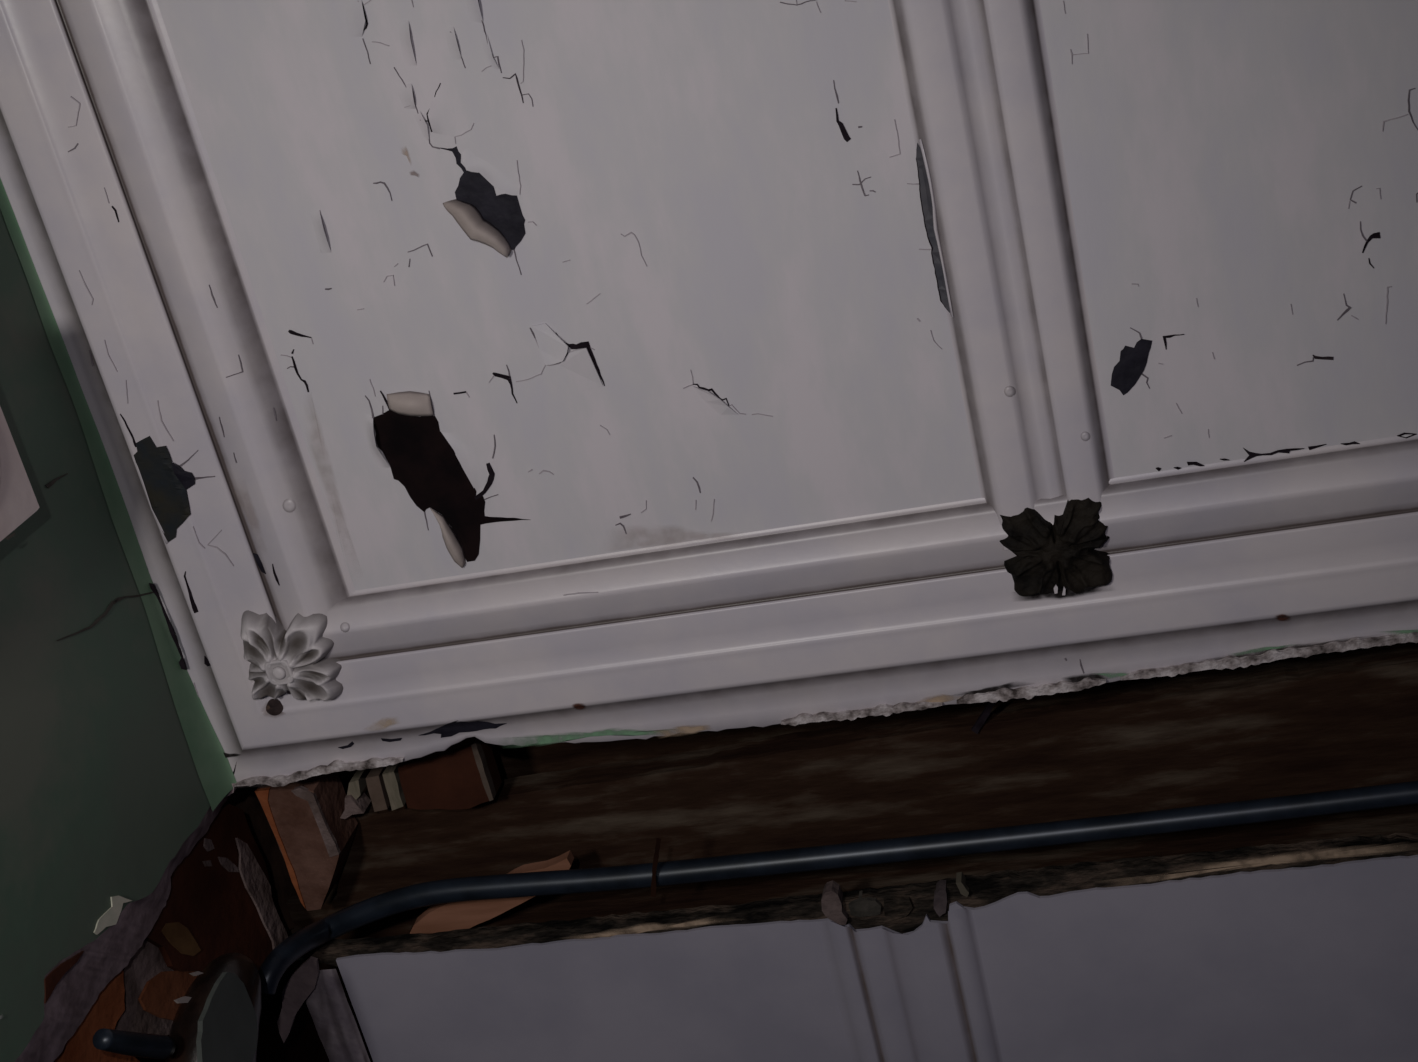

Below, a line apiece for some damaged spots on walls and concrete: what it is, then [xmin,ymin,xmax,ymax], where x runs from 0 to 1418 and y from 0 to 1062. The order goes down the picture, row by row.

crack [344,0,533,144]
crack [833,80,900,196]
peeling [429,138,525,275]
peeling [907,139,953,317]
crack [1337,186,1391,324]
crack [280,330,313,392]
crack [453,323,605,403]
peeling [1111,327,1152,395]
crack [1158,298,1215,365]
peeling [120,414,215,544]
peeling [361,379,529,568]
peeling [381,720,507,742]